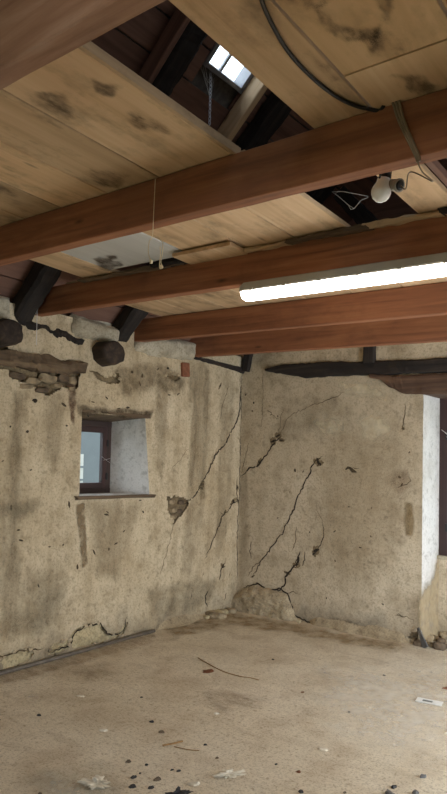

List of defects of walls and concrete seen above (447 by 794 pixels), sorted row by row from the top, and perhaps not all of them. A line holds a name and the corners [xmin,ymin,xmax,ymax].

damp [80,406,151,418]
flaking render [167,495,190,524]
crack [185,360,343,623]
damp [76,503,87,567]
crack [0,617,127,657]